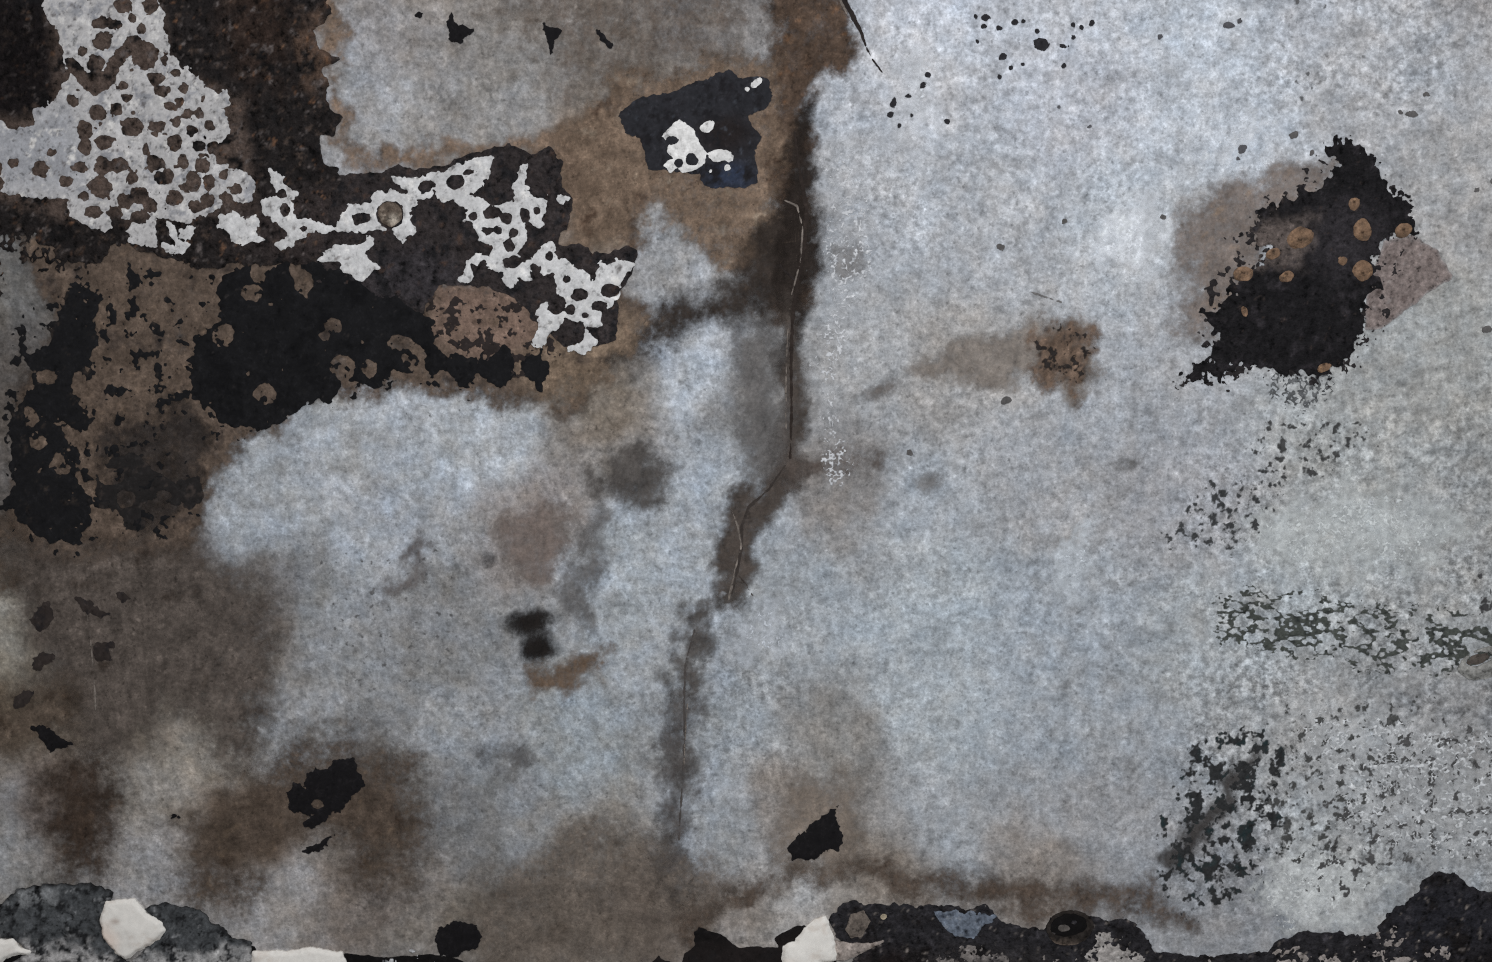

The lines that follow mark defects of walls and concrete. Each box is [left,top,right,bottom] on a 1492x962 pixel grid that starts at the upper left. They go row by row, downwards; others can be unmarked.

crack [839,0,883,73]
peeling [619,69,773,189]
peeling [0,0,636,558]
corrosion [1338,257,1373,281]
corrosion [1348,198,1372,241]
water stain [319,284,651,419]
crack [728,131,809,600]
corrosion [913,320,1100,405]
water stain [0,235,432,909]
crack [678,629,695,841]
water stain [1157,696,1492,934]
peeling [0,882,347,962]